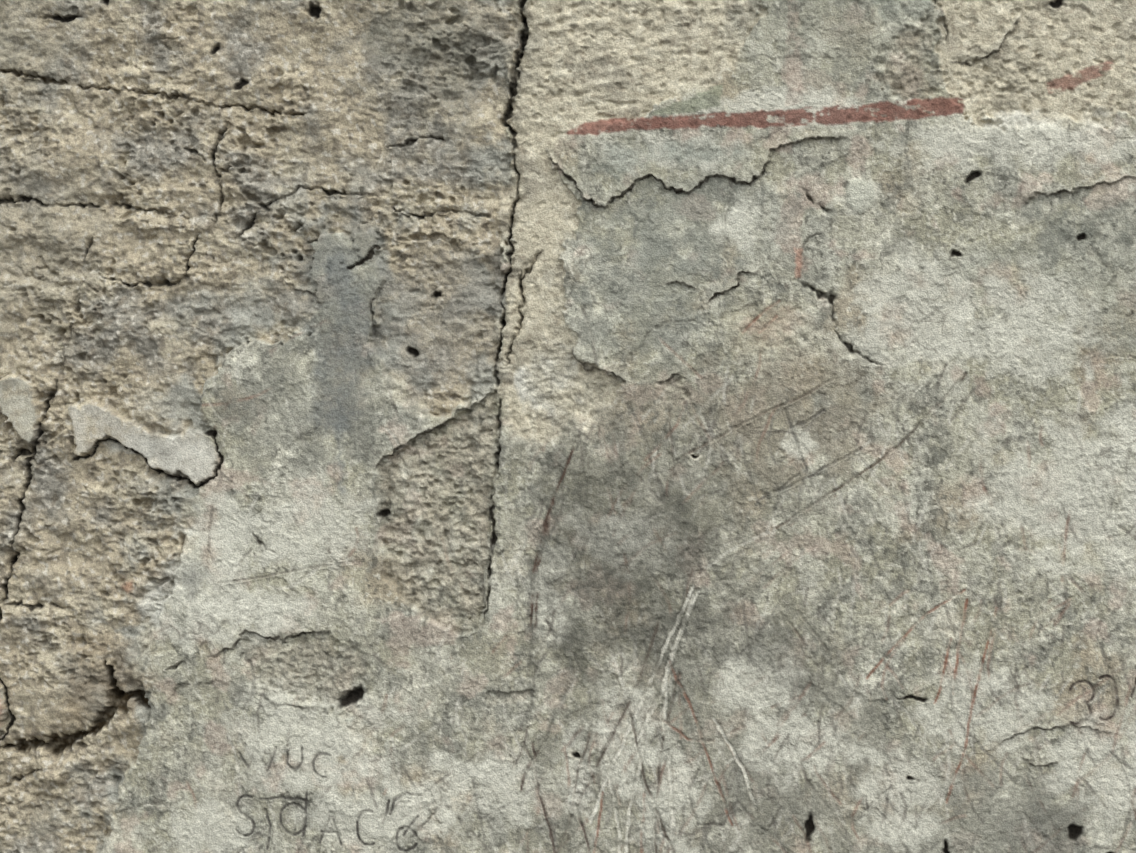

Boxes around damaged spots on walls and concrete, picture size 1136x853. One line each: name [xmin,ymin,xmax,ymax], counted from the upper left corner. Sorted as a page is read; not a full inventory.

crack [0,0,544,630]